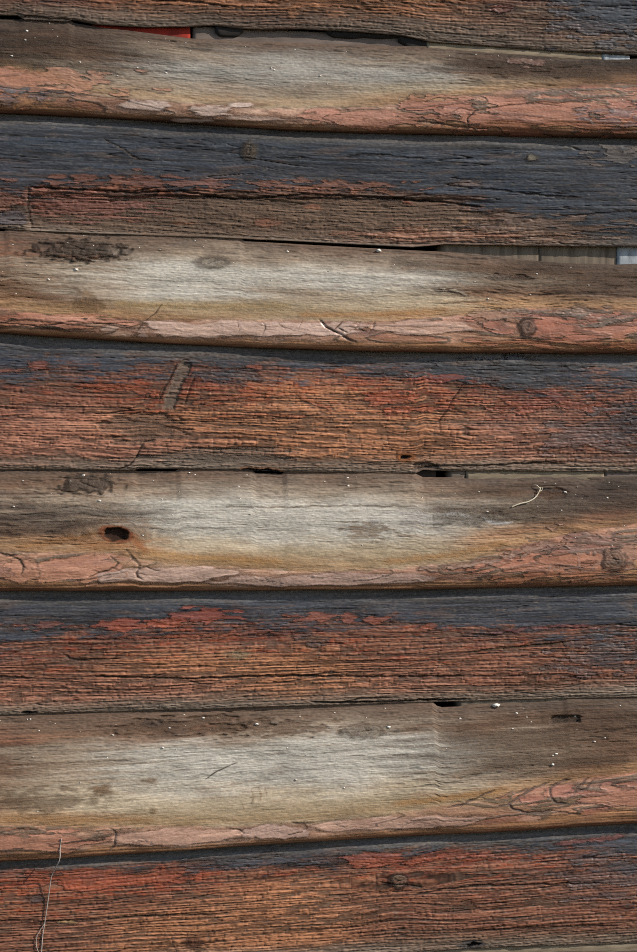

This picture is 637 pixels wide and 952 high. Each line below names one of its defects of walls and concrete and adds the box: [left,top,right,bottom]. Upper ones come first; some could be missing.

peeling [544,0,637,49]
peeling [189,364,333,410]
peeling [358,353,637,462]
spalling [136,447,292,465]
peeling [0,605,266,633]
peeling [282,611,392,650]
peeling [489,623,637,679]
peeling [17,851,509,902]
peeling [544,834,637,902]